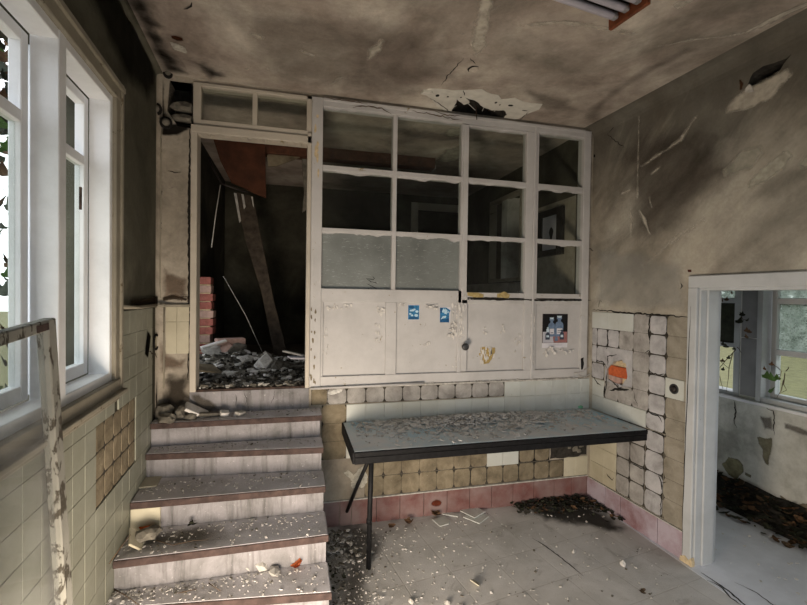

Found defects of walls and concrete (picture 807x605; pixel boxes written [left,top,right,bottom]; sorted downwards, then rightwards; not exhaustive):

water stain [473,0,491,53]
spalling [745,56,790,93]
flaking render [421,88,542,120]
peeling [574,314,688,529]
peeling [757,437,772,465]